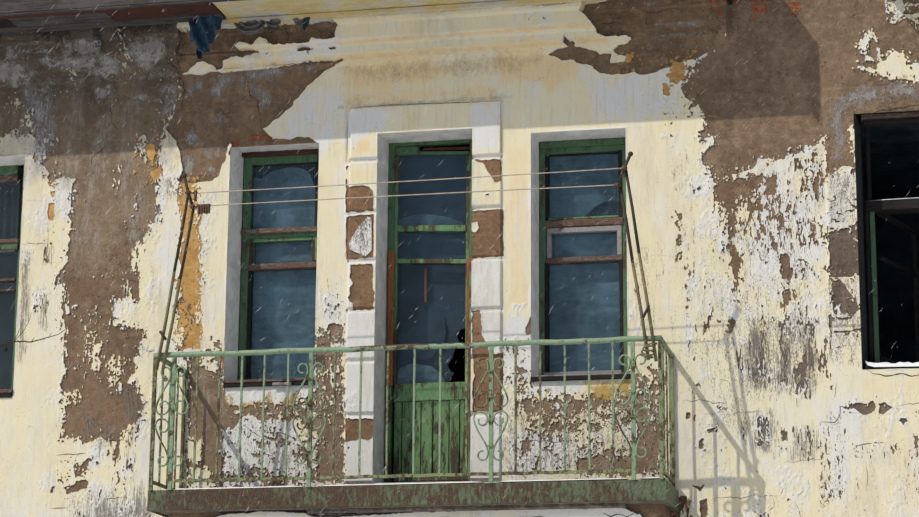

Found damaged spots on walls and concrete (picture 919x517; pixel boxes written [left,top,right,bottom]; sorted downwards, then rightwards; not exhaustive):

peeling [0,21,375,514]
spalling [472,209,504,259]
spalling [475,159,502,182]
peeling [549,0,919,399]
peeling [471,310,670,479]
damp [738,410,779,453]
damp [742,320,820,403]
damp [790,427,819,463]
peeling [757,417,919,511]
peeling [840,396,892,435]